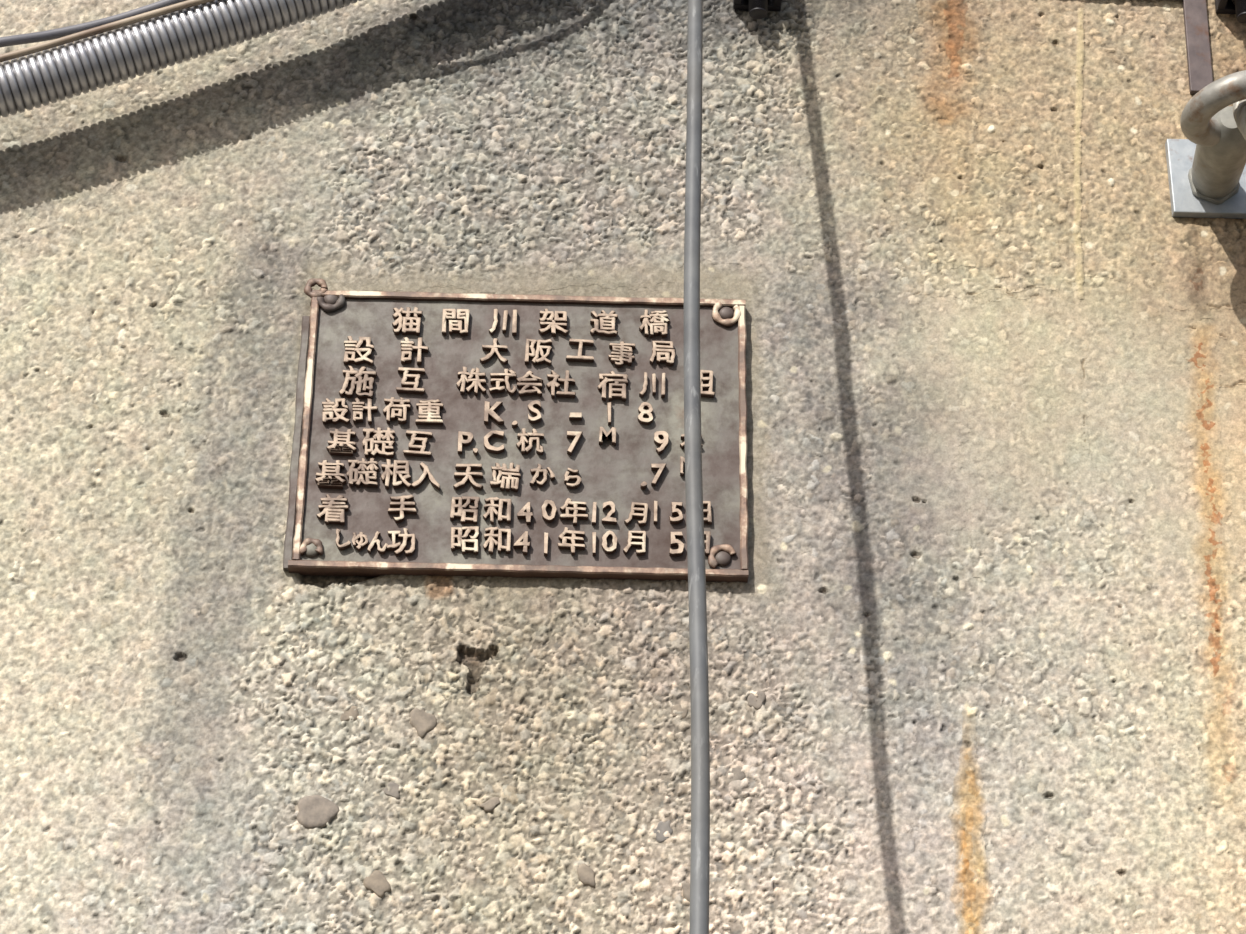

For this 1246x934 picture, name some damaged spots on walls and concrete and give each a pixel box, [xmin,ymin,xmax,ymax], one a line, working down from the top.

rust [900,0,1012,278]
rust [1177,321,1246,934]
rust [948,705,995,934]